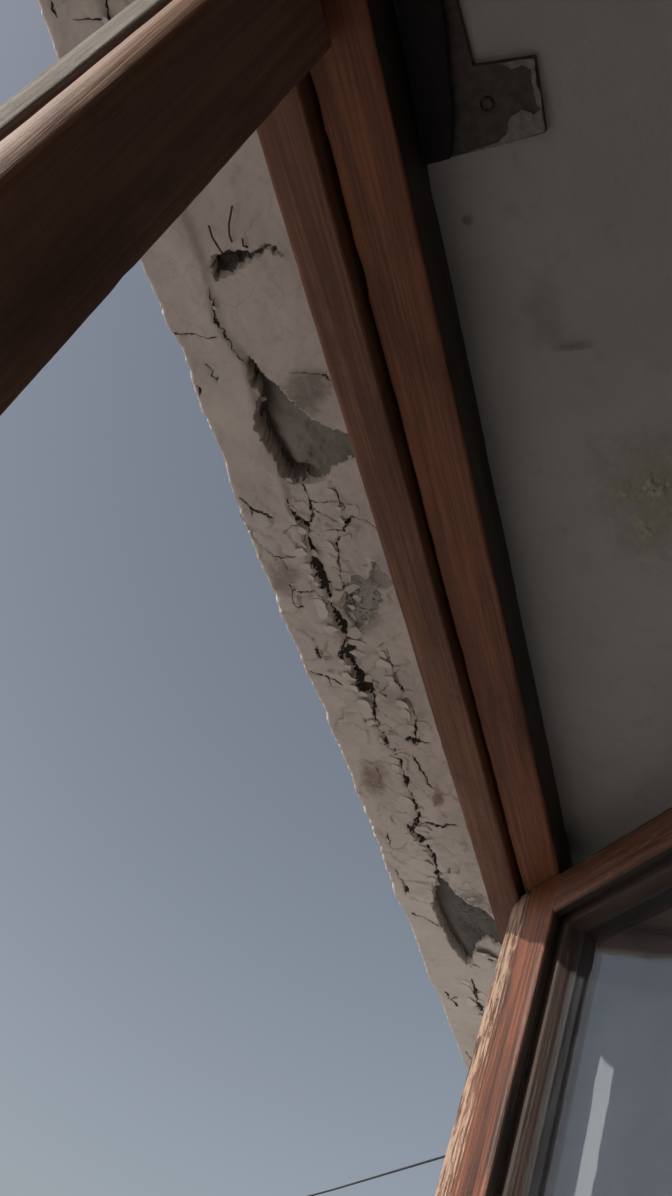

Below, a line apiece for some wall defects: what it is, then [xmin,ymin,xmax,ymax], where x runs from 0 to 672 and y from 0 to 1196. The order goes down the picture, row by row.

crack [51,0,111,25]
spalling [208,206,280,273]
crack [172,290,244,397]
spalling [248,359,355,483]
crack [239,460,457,927]
spalling [434,875,502,971]
crack [444,959,498,1018]